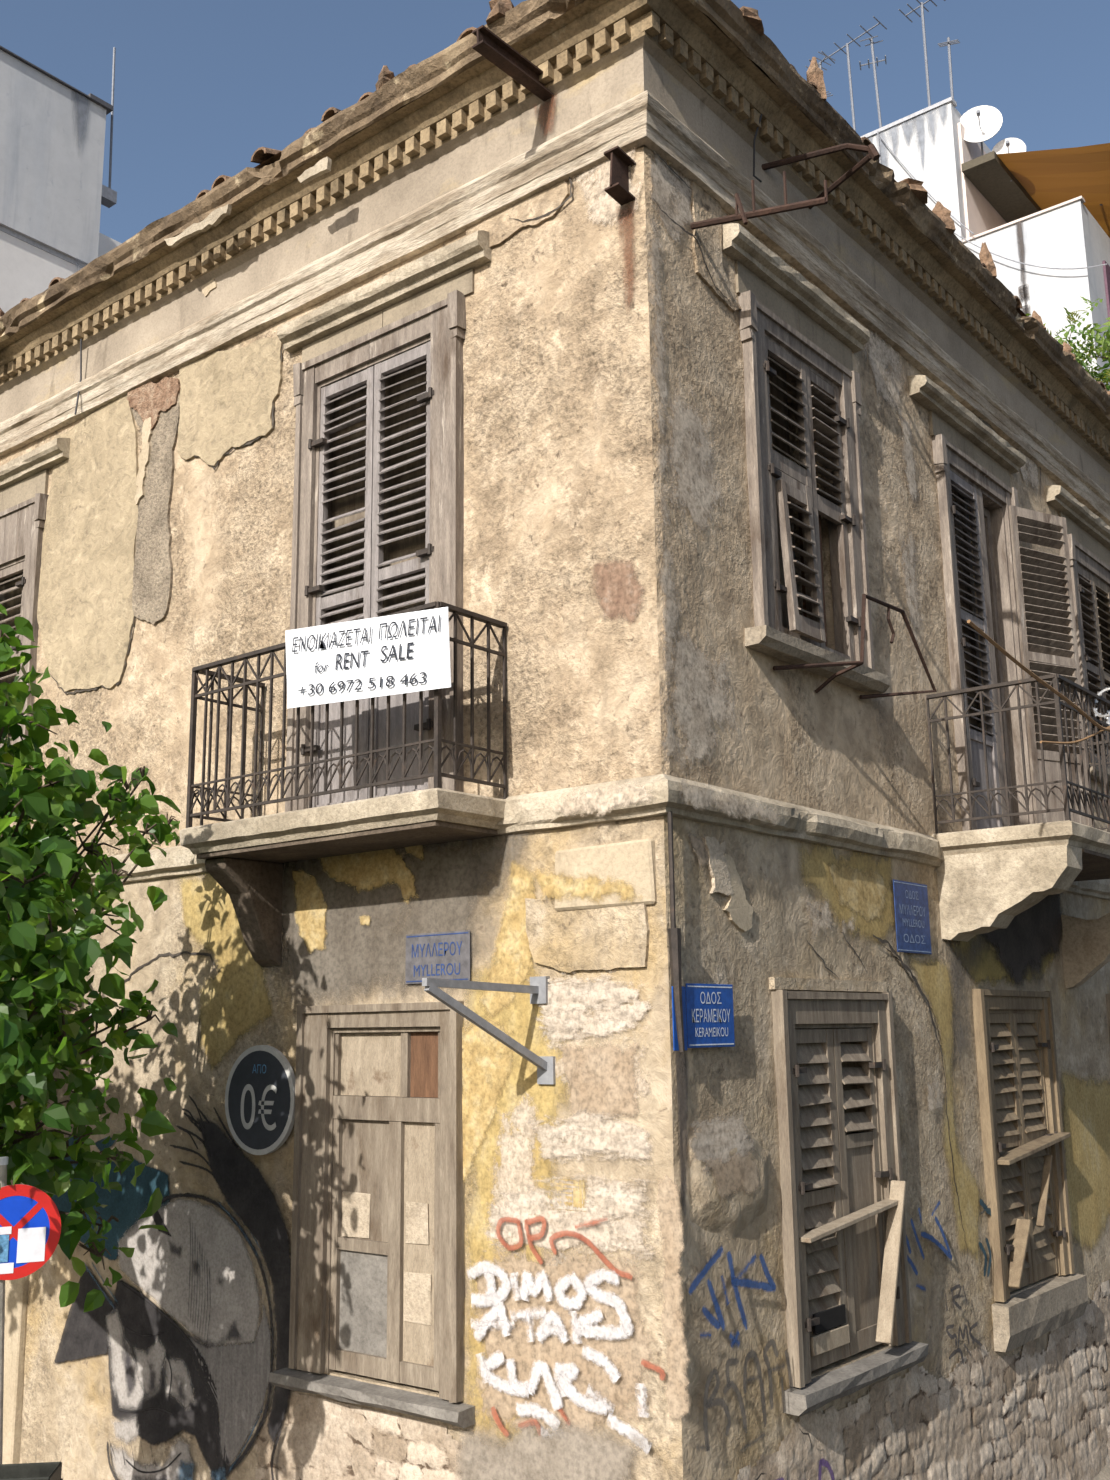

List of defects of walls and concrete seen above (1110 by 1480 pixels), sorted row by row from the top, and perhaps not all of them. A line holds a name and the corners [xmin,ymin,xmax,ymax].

corrosion [621,205,632,303]
flaking render [37,337,284,694]
flaking render [466,148,780,824]
peeling [181,873,272,1069]
peeling [292,845,424,952]
flaking render [689,834,753,932]
peeling [800,845,894,941]
flaking render [462,861,689,1440]
crack [805,904,968,1251]
peeling [912,959,979,1260]
flaking render [254,1391,462,1480]
flaking render [728,1279,1110,1480]